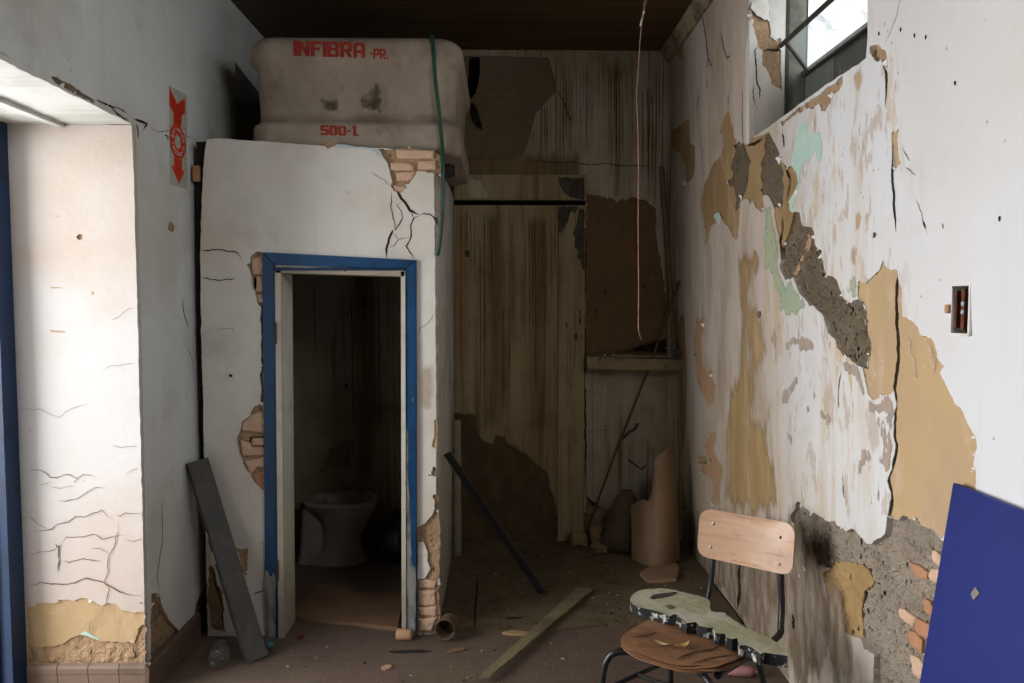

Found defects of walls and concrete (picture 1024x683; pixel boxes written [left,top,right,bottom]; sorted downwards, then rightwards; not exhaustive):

spalling [747,0,783,89]
flaking render [378,147,441,193]
water stain [468,153,578,175]
flaking render [237,252,264,491]
crack [373,173,438,437]
spalling [558,177,667,356]
peeling [699,111,977,683]
crack [888,276,899,517]
crack [31,469,163,629]
spalling [26,593,180,664]
flaking render [406,428,441,636]
water stain [688,517,852,683]